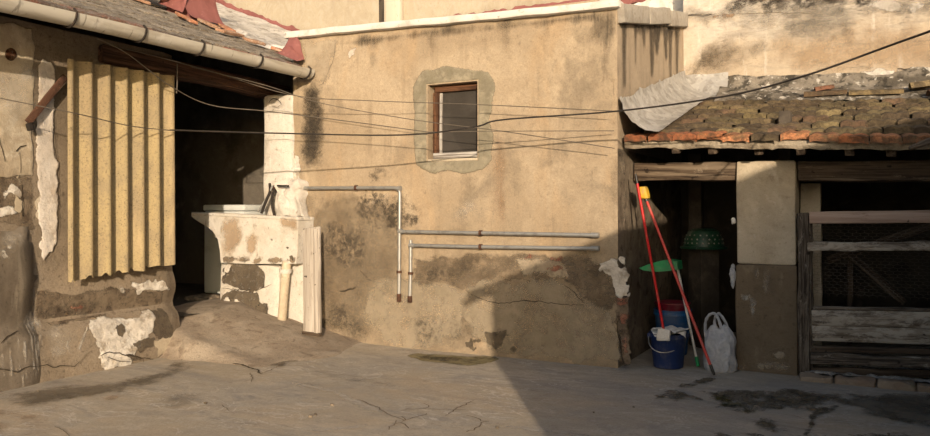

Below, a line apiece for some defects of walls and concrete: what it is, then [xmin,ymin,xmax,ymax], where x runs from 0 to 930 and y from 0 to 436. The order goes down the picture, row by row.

damp [727,0,843,32]
peeling [0,59,59,260]
mould [303,88,322,163]
flaking render [36,279,173,370]
damp [313,195,417,329]
crack [367,278,583,310]
flaking render [413,252,631,366]
crack [233,363,486,432]
damp [843,394,930,426]